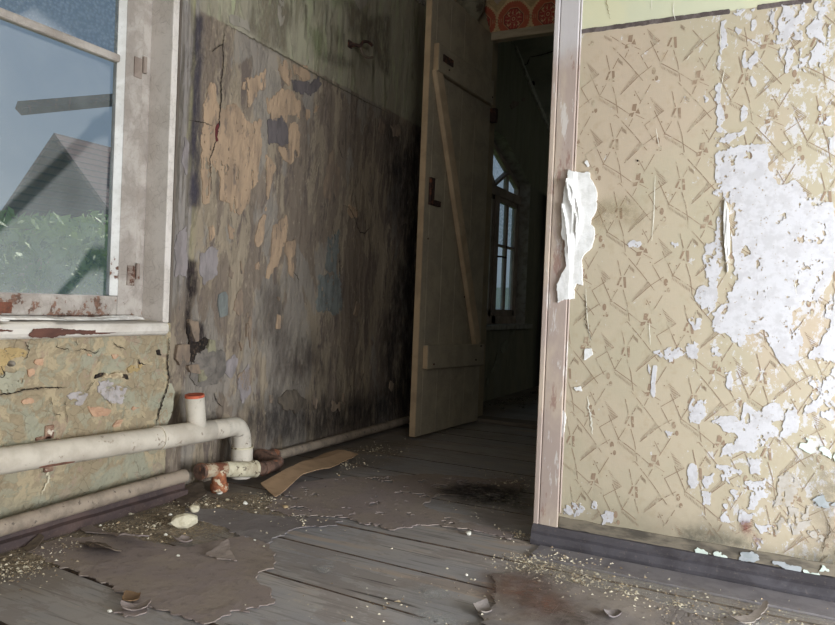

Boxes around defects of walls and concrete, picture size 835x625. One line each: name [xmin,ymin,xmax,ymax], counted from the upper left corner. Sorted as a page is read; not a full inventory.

peeling [769,8,832,74]
peeling [705,83,725,133]
peeling [199,60,322,285]
crack [56,340,145,365]
flaking render [186,323,209,363]
crack [0,369,68,419]
crack [156,339,170,426]
damp [440,484,519,505]
peeling [591,501,614,525]
flaking render [720,486,775,563]
flaking render [694,547,727,558]
flaking render [772,561,829,575]